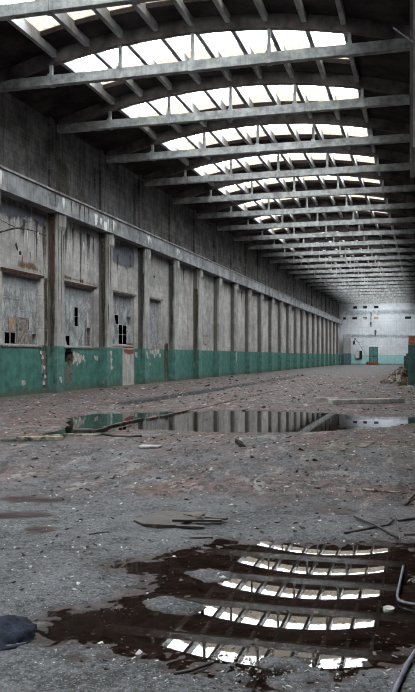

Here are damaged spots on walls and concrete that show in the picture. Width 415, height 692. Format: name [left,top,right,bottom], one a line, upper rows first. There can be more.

leakage [0,199,46,260]
leakage [94,213,116,231]
rust [18,215,83,354]
peeling [39,349,47,387]
spalling [59,348,85,384]